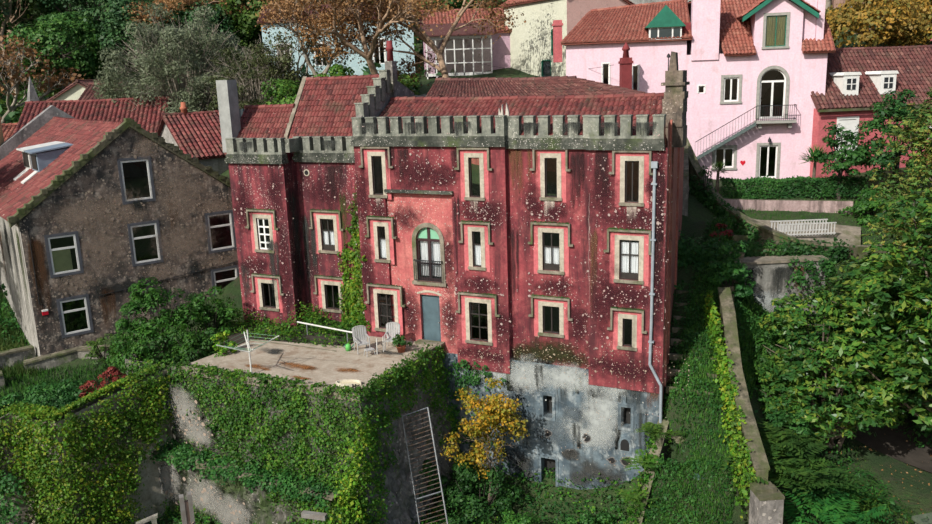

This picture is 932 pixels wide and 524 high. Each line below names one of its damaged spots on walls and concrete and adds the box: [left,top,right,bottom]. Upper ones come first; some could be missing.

peeling [303,146,458,299]
peeling [445,199,506,229]
peeling [512,175,577,224]
peeling [591,145,673,237]
leakage [0,223,49,301]
peeling [437,242,507,366]
leakage [772,267,804,296]
peeling [472,249,690,460]
leakage [536,409,590,443]
leakage [562,450,622,485]
spalling [604,454,632,468]